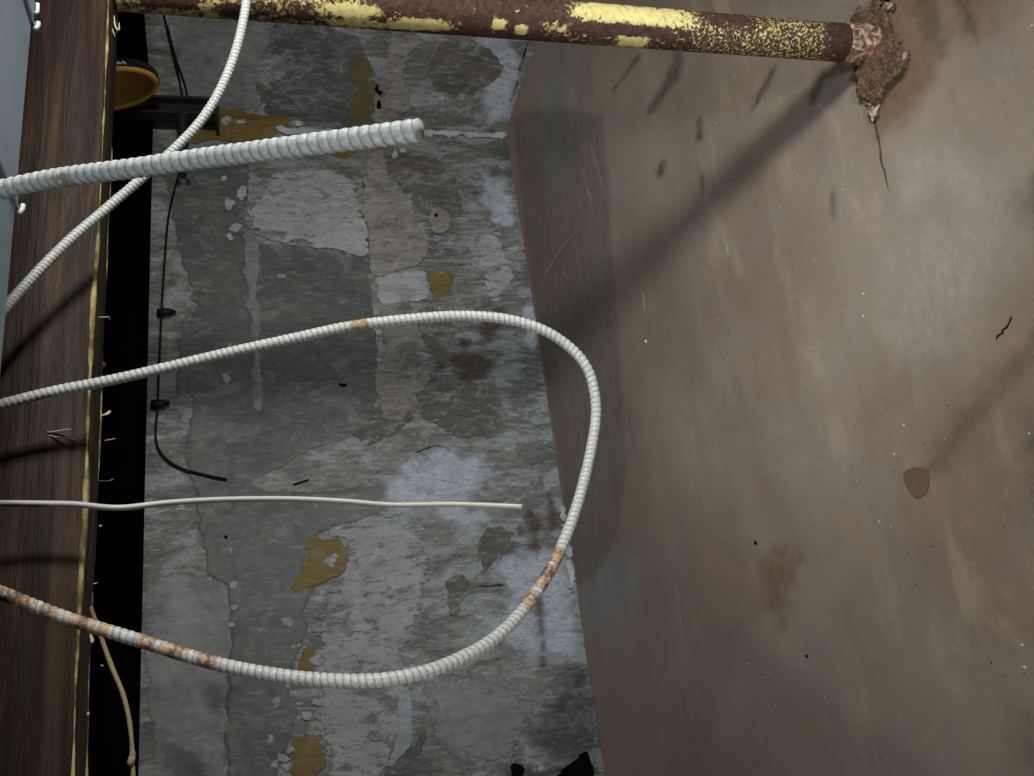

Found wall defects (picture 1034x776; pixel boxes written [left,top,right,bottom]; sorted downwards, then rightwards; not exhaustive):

leakage [477,37,520,124]
spalling [850,0,910,121]
crack [873,118,890,191]
efflorescence [481,172,515,226]
efflorescence [522,306,537,347]
efflorescence [387,449,491,524]
leakage [486,548,579,656]